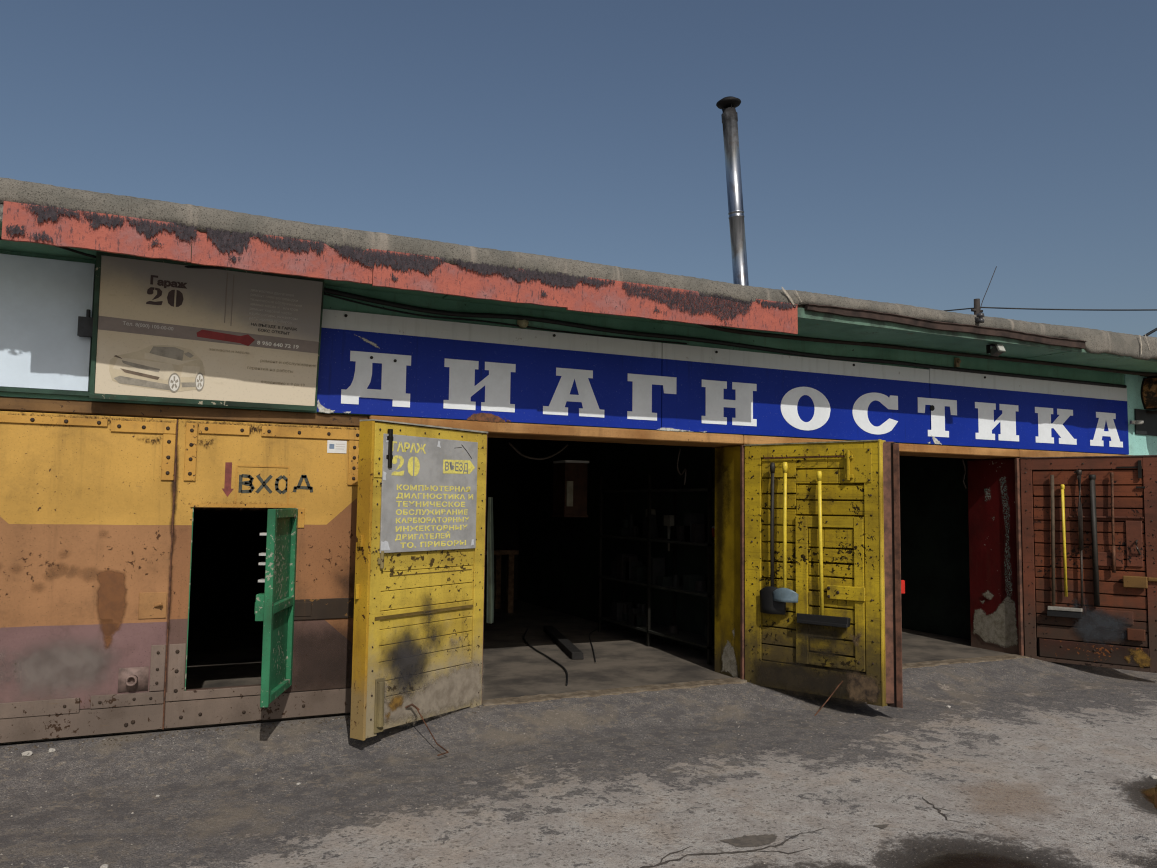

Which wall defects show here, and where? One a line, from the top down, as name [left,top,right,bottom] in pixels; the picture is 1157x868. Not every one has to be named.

peeling [0,200,797,325]
flaking render [973,477,1018,647]
crack [640,828,825,868]